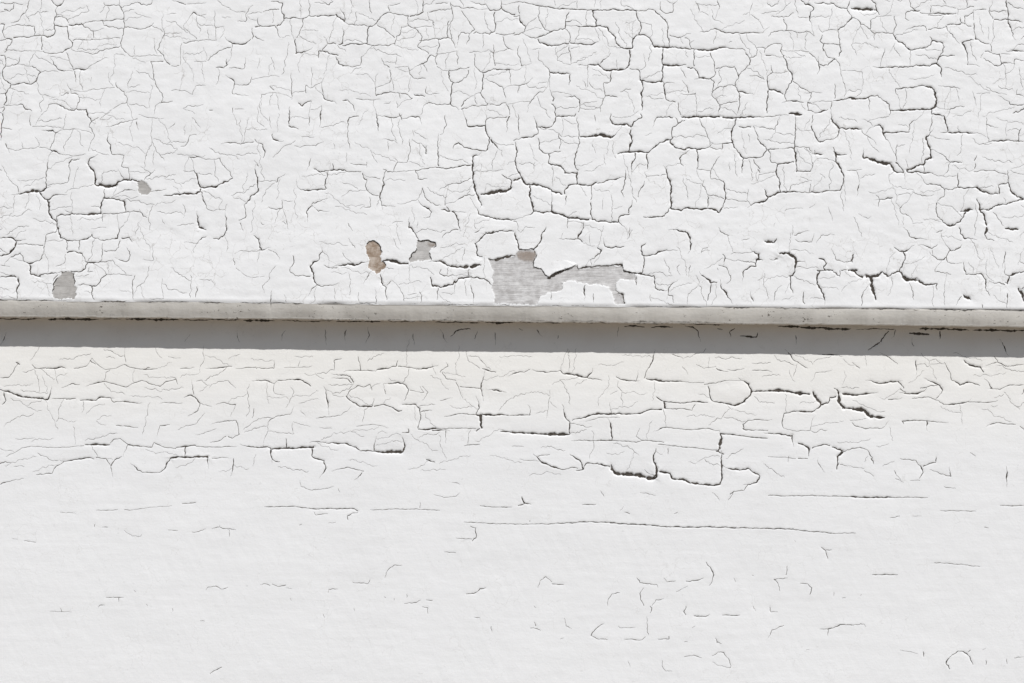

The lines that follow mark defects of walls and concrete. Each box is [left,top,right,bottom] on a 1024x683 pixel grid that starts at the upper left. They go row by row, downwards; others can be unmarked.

peeling [137,180,152,195]
peeling [52,271,77,300]
peeling [365,240,386,273]
peeling [409,239,436,263]
crack [0,0,1024,528]
peeling [489,245,643,304]
crack [449,492,837,557]
crack [564,562,812,671]